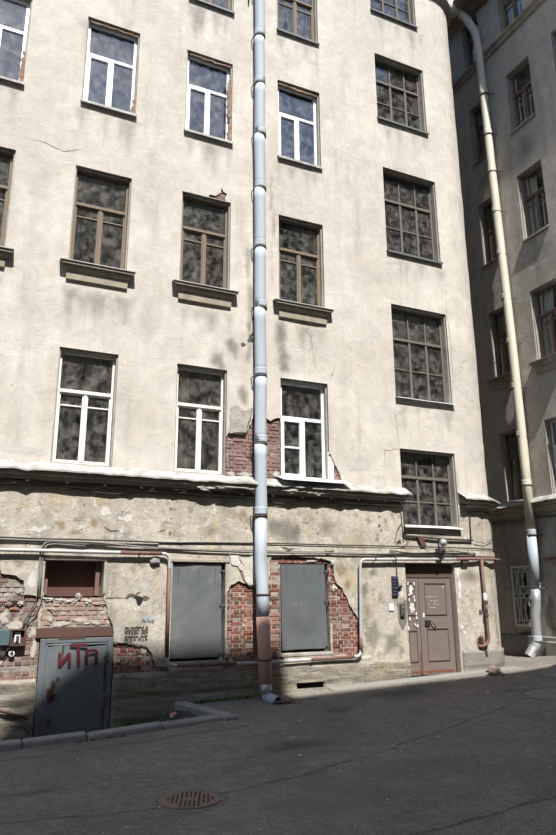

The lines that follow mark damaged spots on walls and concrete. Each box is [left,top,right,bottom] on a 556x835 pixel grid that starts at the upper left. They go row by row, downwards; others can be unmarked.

flaking render [225,405,255,477]
flaking render [266,418,280,479]
peeling [94,504,134,534]
flaking render [0,565,112,681]
flaking render [224,555,258,668]
flaking render [112,643,169,679]